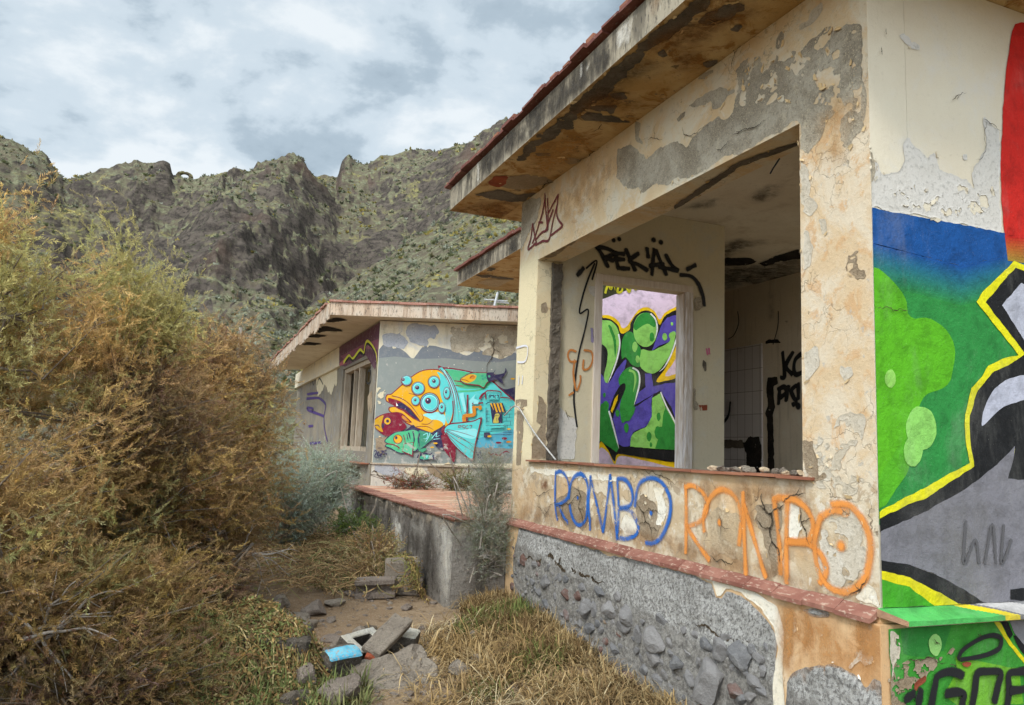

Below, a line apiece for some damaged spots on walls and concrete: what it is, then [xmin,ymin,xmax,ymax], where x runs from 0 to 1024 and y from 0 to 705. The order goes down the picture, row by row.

damp [453,203,517,219]
damp [467,24,631,184]
peeling [517,0,867,270]
peeling [869,117,1002,232]
peeling [382,323,518,359]
peeling [802,412,866,499]
peeling [620,515,639,535]
peeling [644,487,667,526]
crack [757,490,809,561]
peeling [779,504,881,608]
peeling [705,579,799,705]
peeling [888,631,910,692]